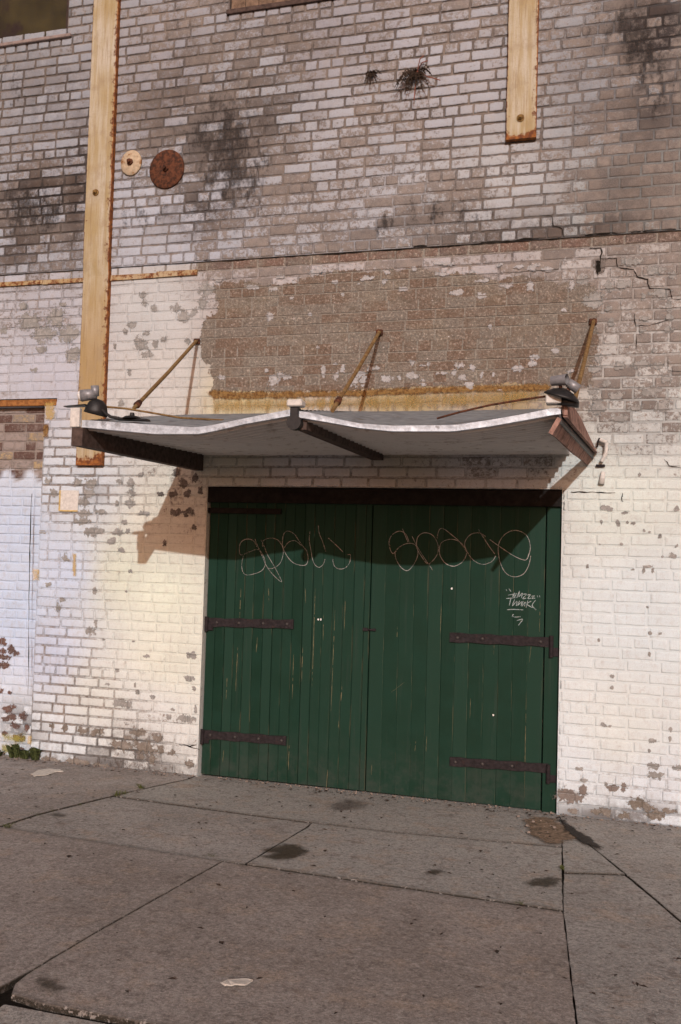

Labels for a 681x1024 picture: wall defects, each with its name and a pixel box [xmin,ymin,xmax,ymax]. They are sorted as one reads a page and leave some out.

leakage [192,100,264,206]
crack [324,215,680,347]
peeling [113,321,167,358]
peeling [170,256,678,422]
peeling [73,472,150,553]
peeling [157,467,203,530]
spalling [0,637,19,669]
spalling [0,689,30,742]
peeling [647,727,681,780]
spalling [517,767,678,844]